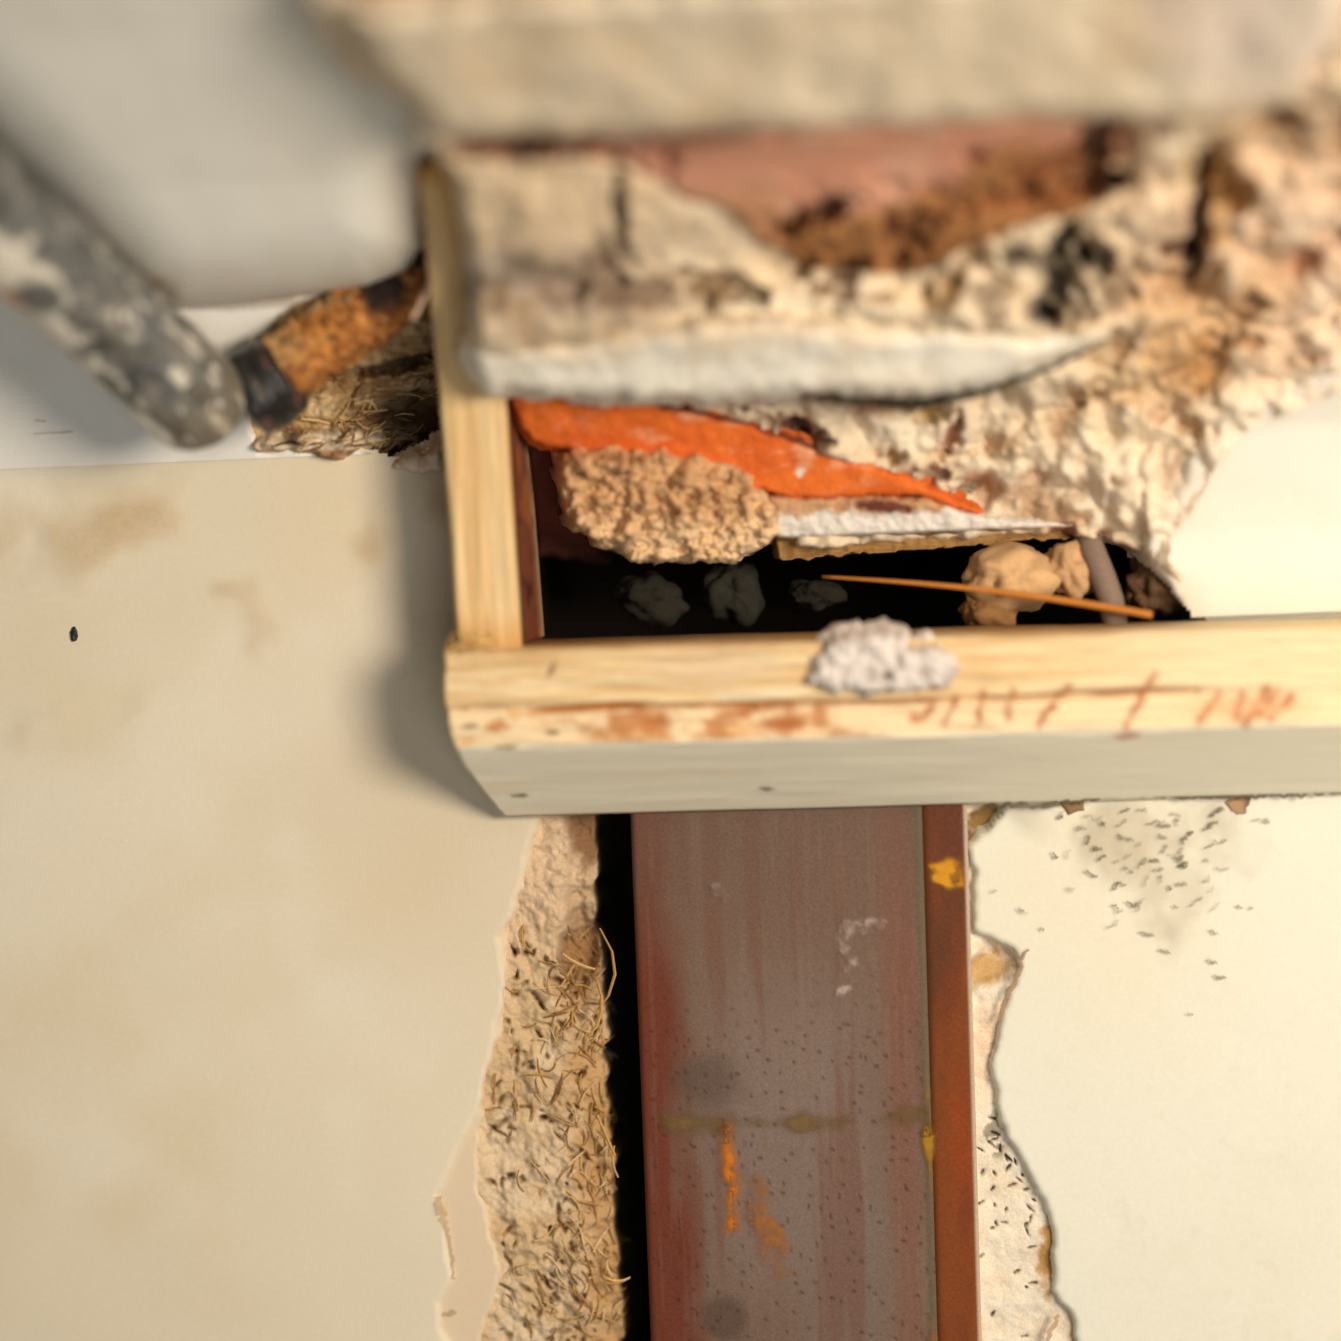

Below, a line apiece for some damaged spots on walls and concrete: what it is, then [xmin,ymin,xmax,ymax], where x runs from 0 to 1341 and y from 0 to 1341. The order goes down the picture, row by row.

spalling [310,0,1341,607]
spalling [477,813,651,1341]
corrosion [666,1116,784,1247]
corrosion [900,1111,934,1162]
spalling [967,804,1074,1341]
spalling [1085,821,1106,878]